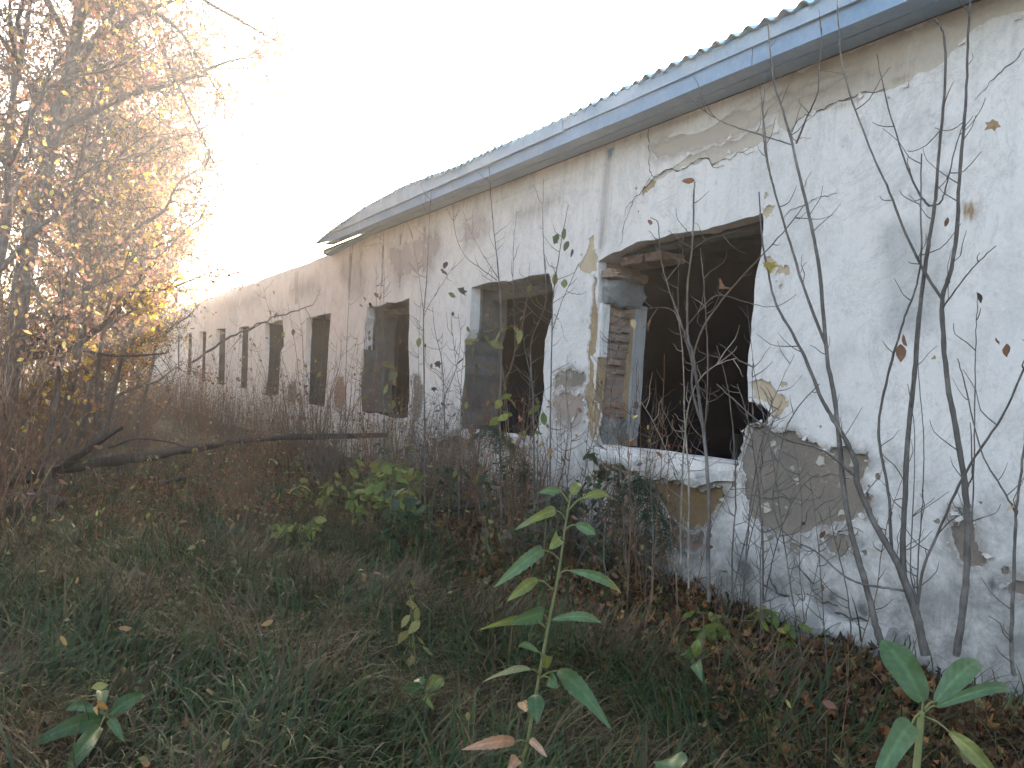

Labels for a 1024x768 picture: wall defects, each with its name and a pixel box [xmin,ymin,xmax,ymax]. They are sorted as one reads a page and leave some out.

crack [620,129,754,244]
peeling [635,0,1024,195]
peeling [551,236,603,441]
peeling [653,379,881,563]
peeling [934,501,993,572]